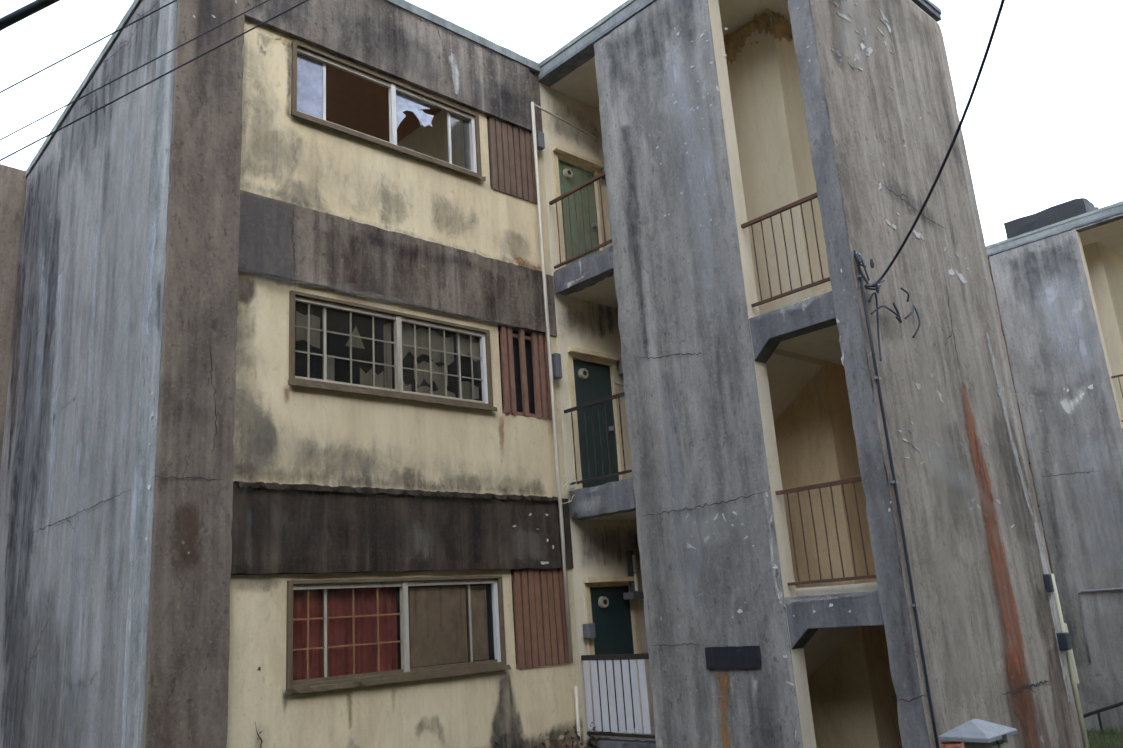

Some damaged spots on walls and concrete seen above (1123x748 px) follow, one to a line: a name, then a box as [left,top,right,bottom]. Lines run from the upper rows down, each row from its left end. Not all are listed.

crack [34,343,225,532]
damp [240,400,281,477]
spalling [1060,384,1093,414]
crack [641,491,766,517]
rust [962,388,1051,748]
damp [491,676,582,748]